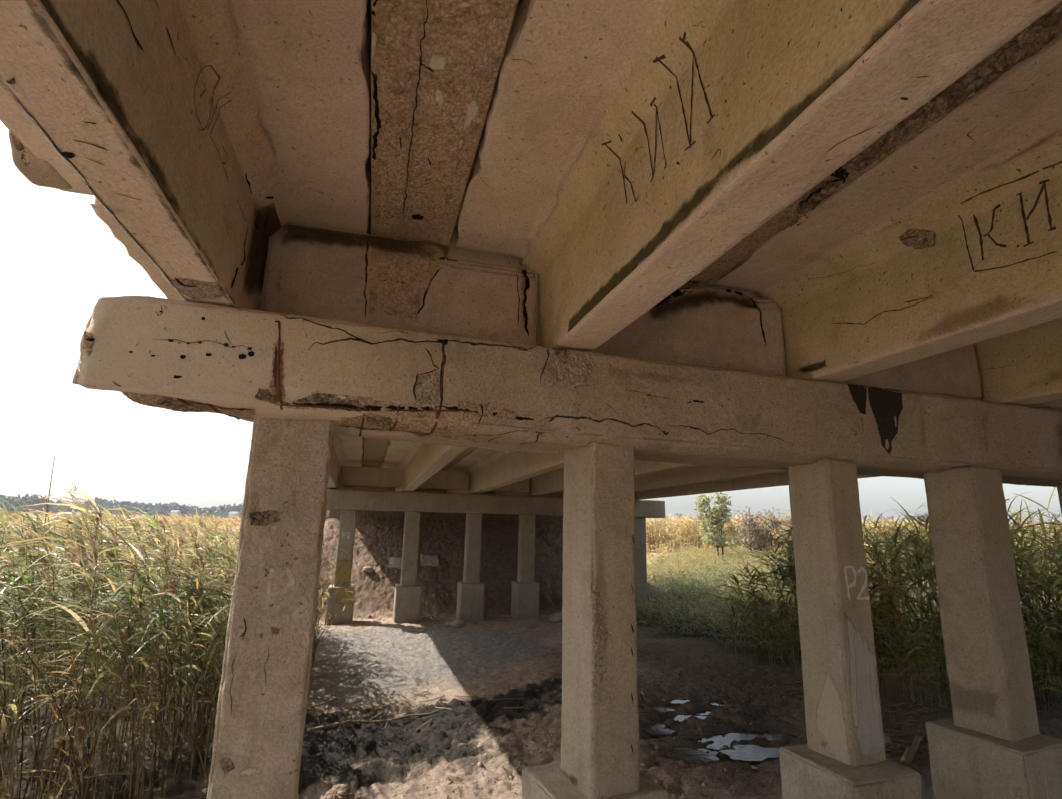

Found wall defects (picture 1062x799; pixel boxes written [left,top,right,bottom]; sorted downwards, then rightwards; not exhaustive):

crack [116,0,144,51]
crack [365,0,435,223]
spalling [899,228,936,250]
crack [280,246,535,369]
corrosion [273,321,284,410]
spalling [122,341,546,443]
crack [488,390,793,445]
leakage [845,383,903,455]